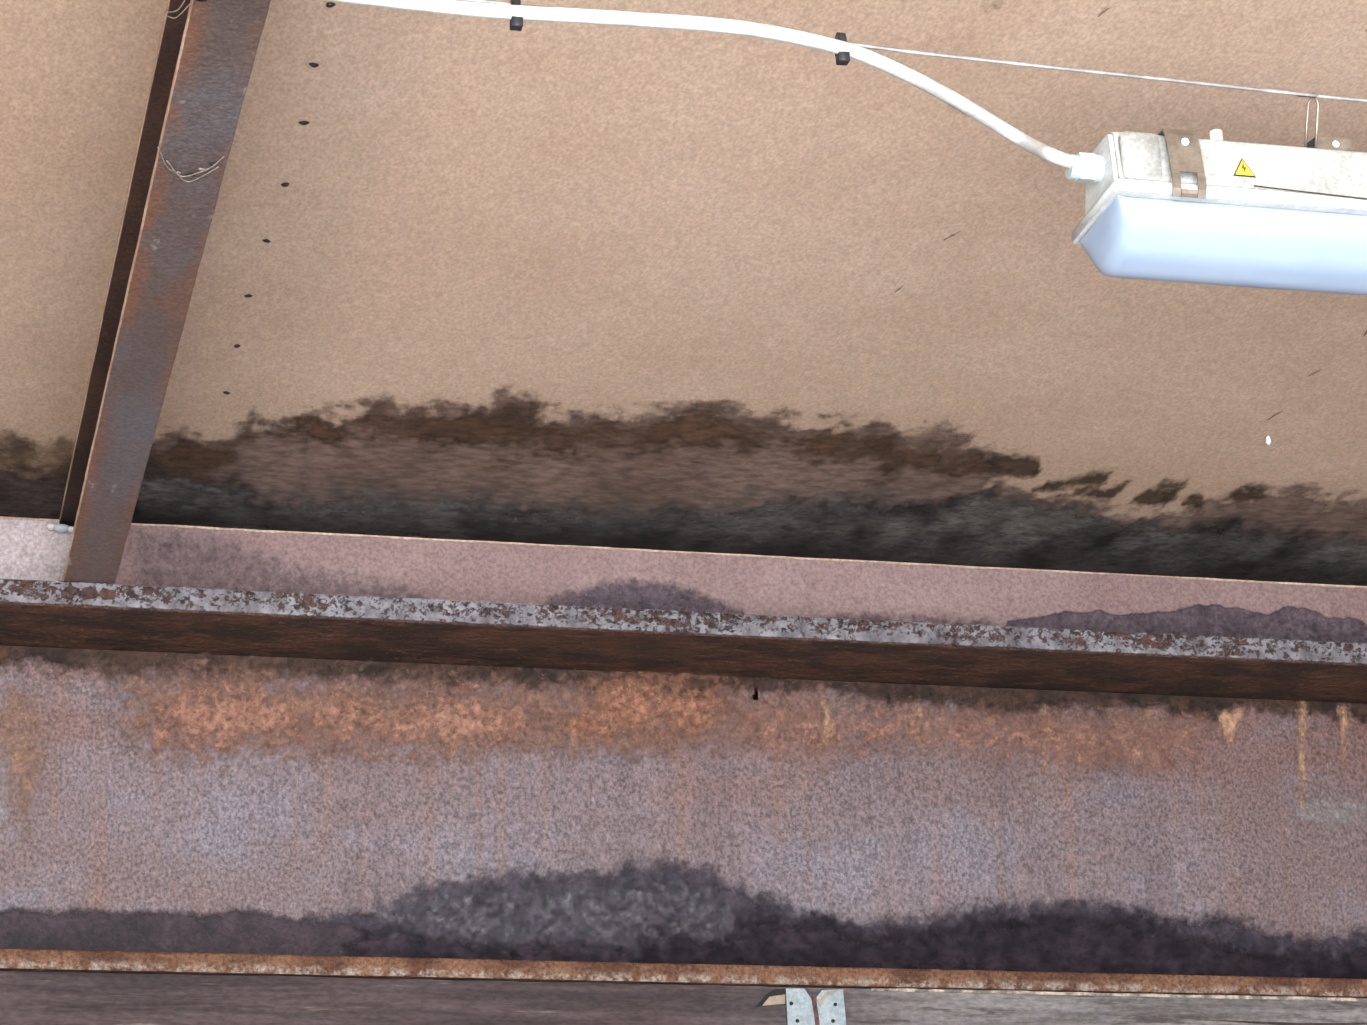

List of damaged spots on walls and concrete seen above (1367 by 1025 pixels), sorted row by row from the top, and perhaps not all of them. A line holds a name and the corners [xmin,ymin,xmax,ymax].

water stain [0,434,74,519]
water stain [131,389,1367,586]
rust [40,585,116,604]
water stain [546,579,743,615]
water stain [1006,604,1367,644]
rust [0,645,1367,780]
water stain [0,861,1367,979]